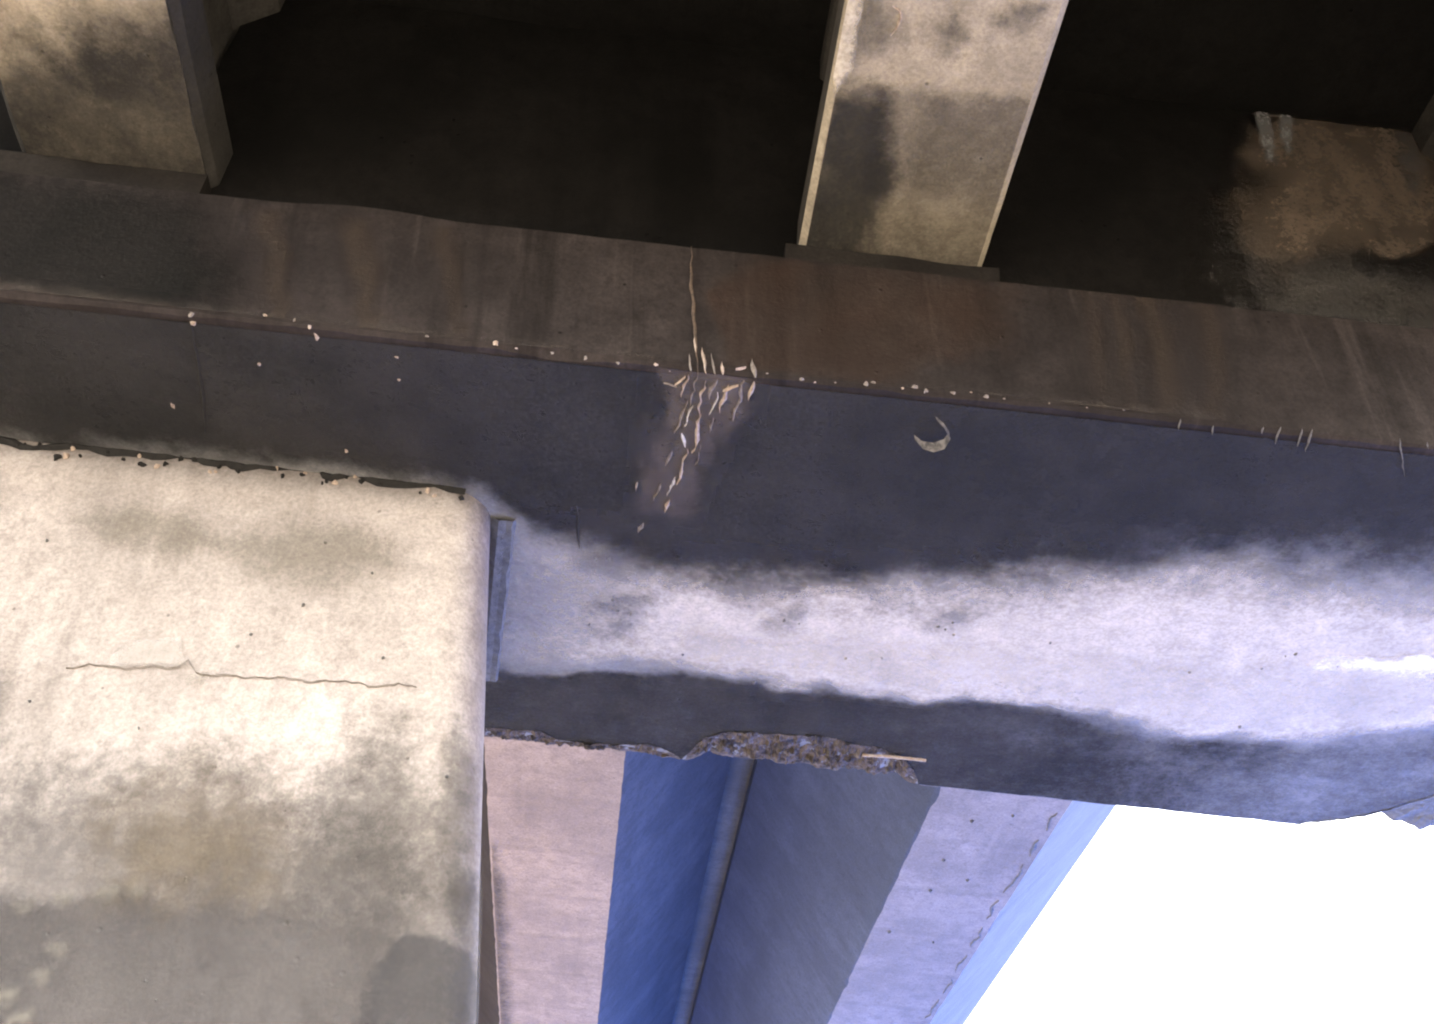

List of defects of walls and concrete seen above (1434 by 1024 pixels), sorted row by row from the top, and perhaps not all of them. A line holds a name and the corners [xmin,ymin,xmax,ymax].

crack [689,248,698,371]
efflorescence [636,337,768,513]
crack [66,640,417,688]
leakage [536,556,1434,739]
spalling [484,728,926,784]